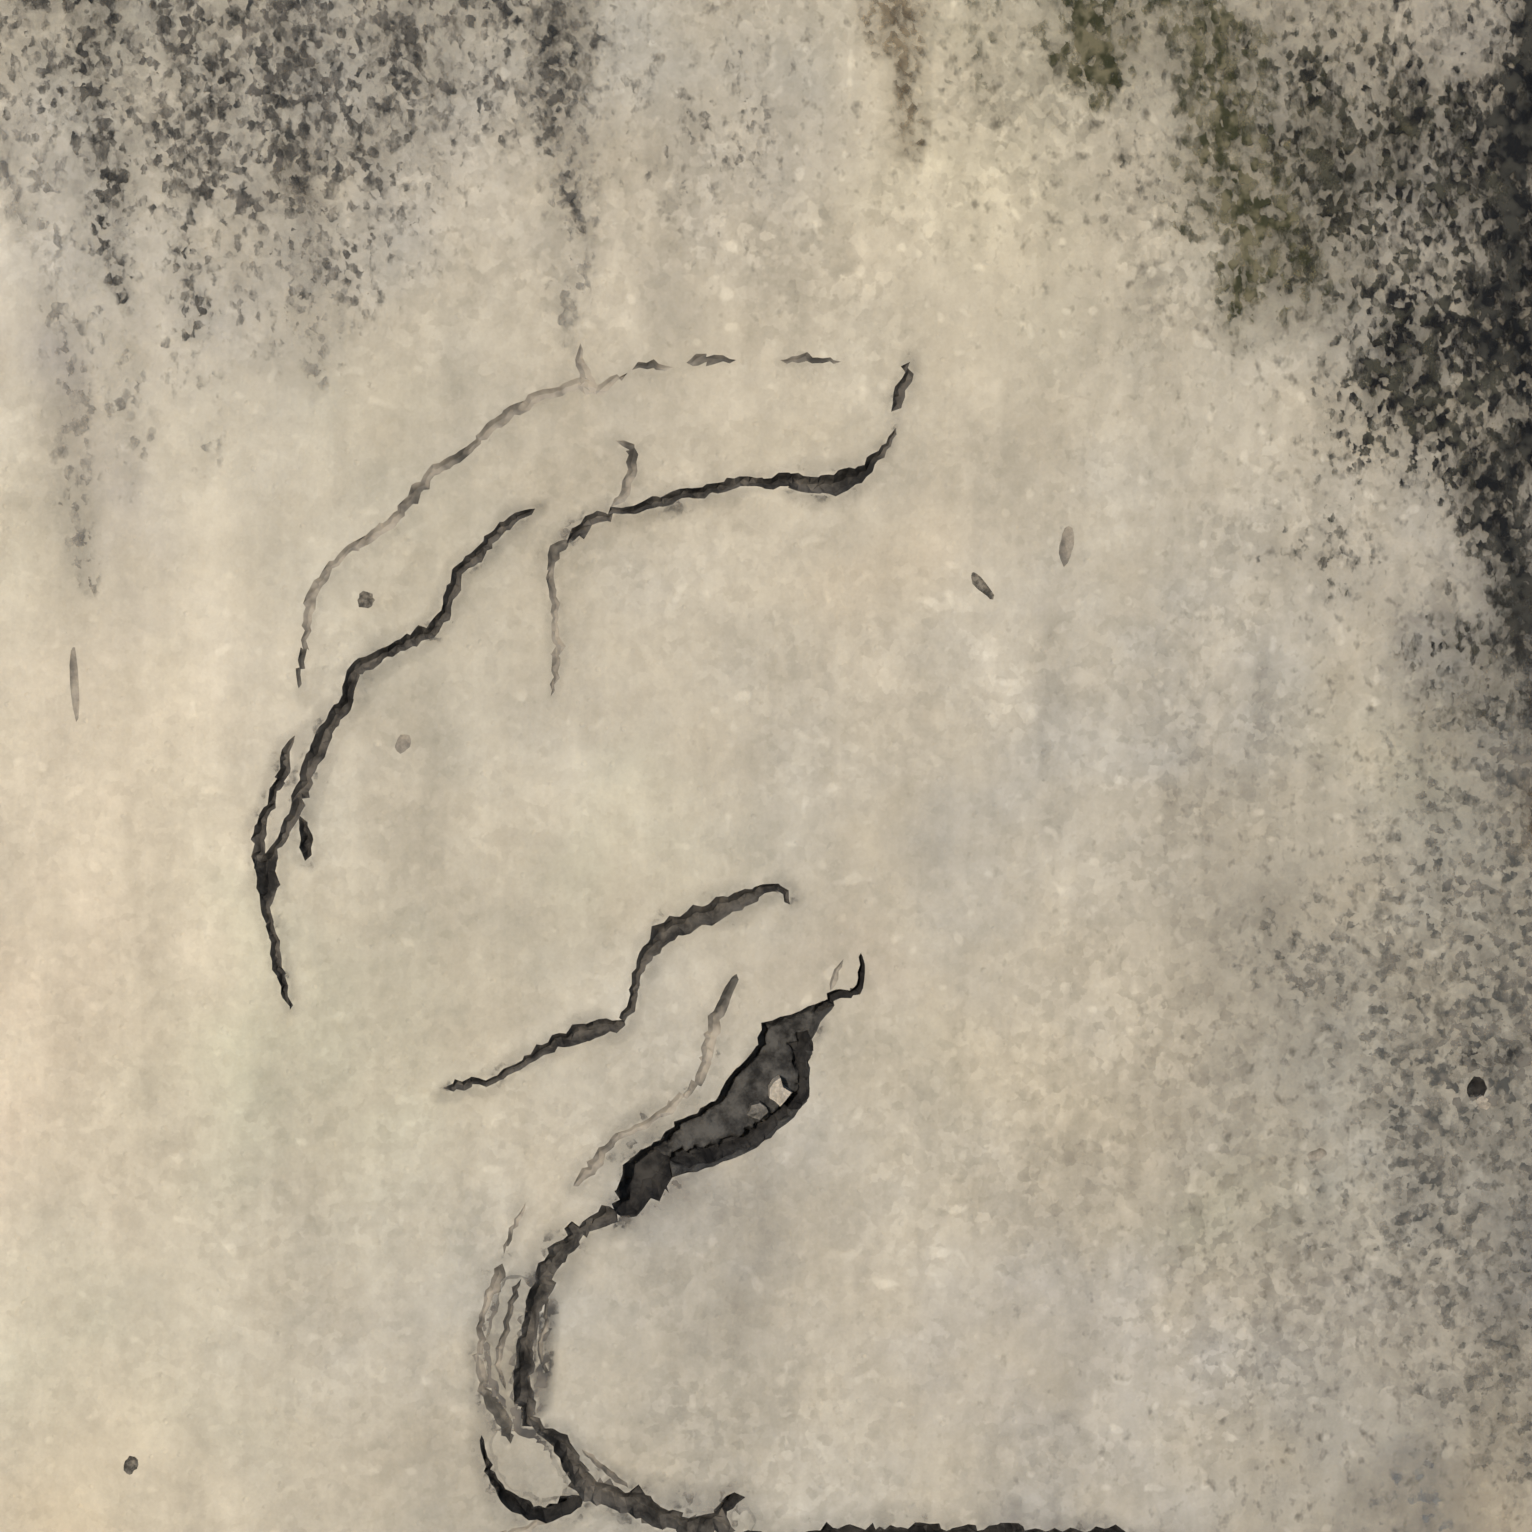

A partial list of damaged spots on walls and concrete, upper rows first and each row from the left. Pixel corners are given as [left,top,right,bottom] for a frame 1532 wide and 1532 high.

leakage [0,0,605,341]
crack [251,344,914,1009]
crack [472,974,761,1532]
crack [444,884,793,1092]
crack [807,1522,1125,1532]
leakage [1205,0,1532,1482]